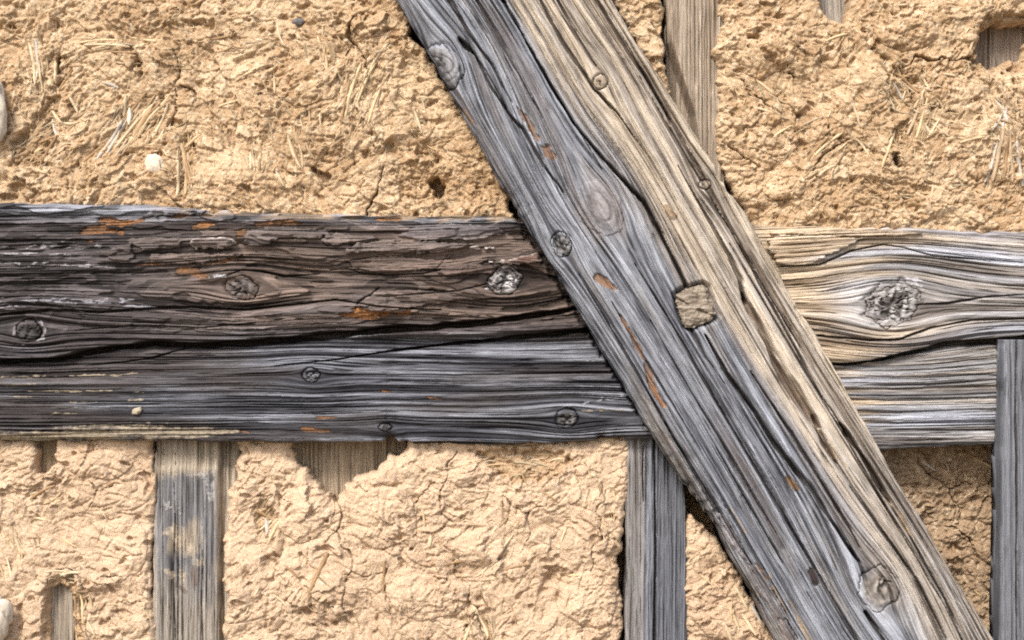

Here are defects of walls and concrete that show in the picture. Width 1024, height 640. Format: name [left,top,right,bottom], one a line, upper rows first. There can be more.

spalling [971,10,1024,75]
crack [366,166,384,216]
crack [0,268,590,366]
spalling [40,575,86,640]